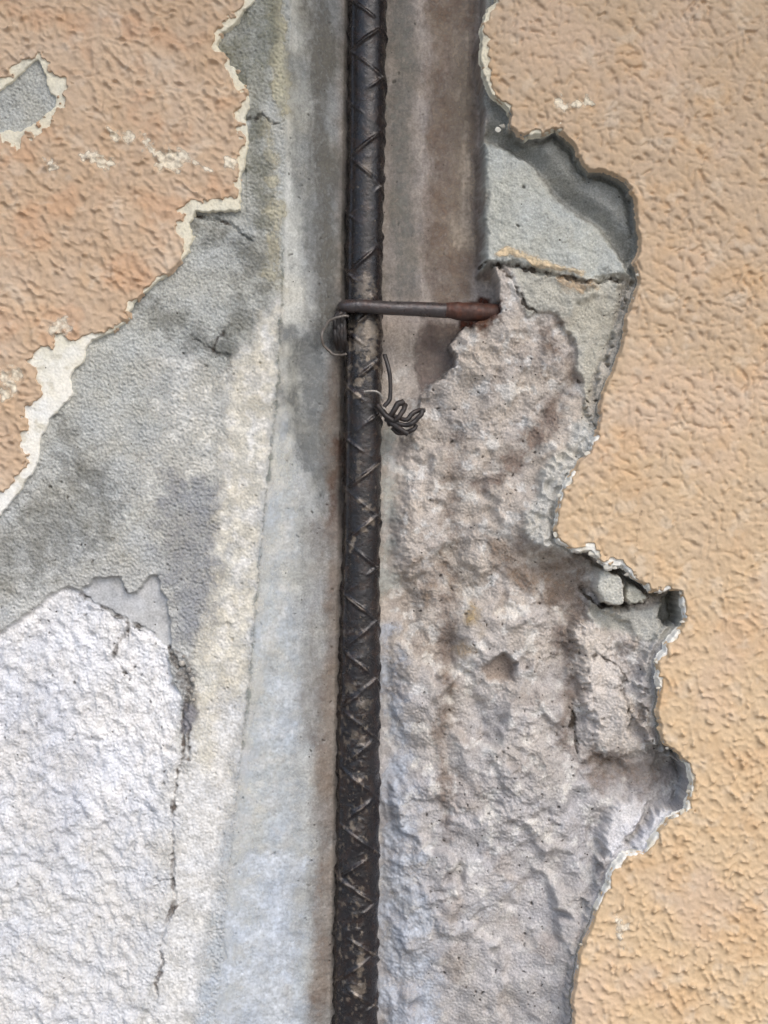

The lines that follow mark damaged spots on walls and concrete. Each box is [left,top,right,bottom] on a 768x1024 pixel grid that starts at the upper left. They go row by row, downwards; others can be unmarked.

corrosion [386,0,501,391]
crack [478,261,619,313]
peeling [0,0,291,1024]
spalling [389,0,695,1024]
crack [154,842,178,995]
crack [168,646,192,811]